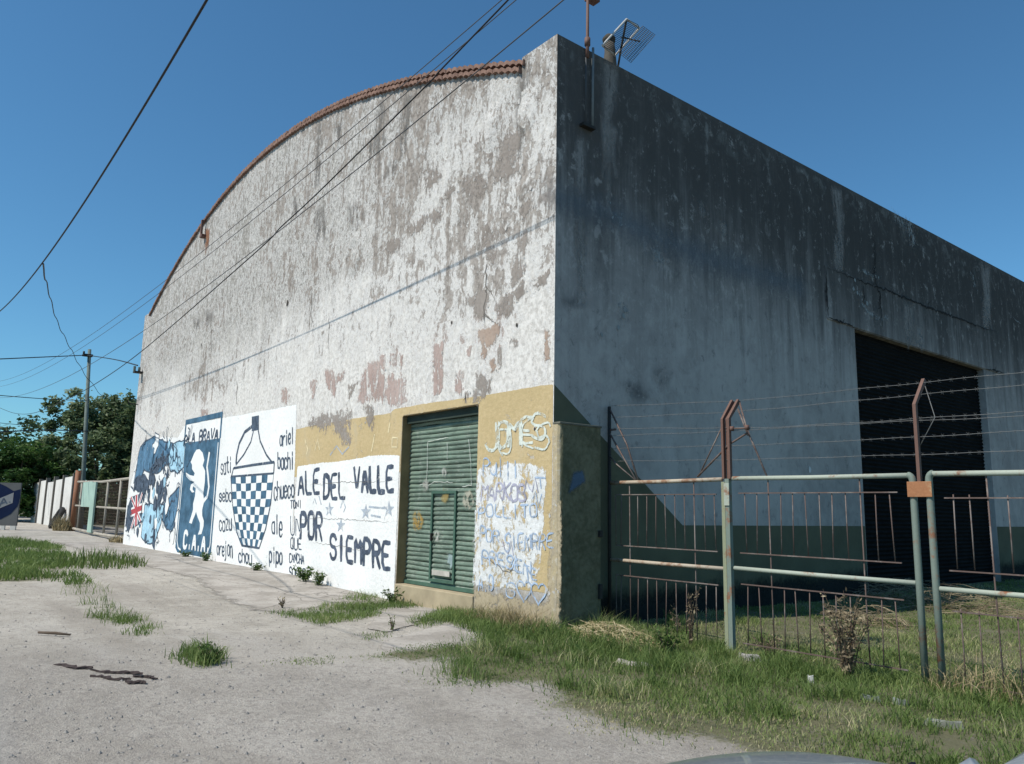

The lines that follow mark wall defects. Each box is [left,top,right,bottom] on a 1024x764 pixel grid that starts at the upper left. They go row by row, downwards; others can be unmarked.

flaking render [384,128,524,255]
peeling [432,198,551,406]
crack [826,241,1021,331]
water stain [982,267,990,326]
peeling [308,353,408,445]